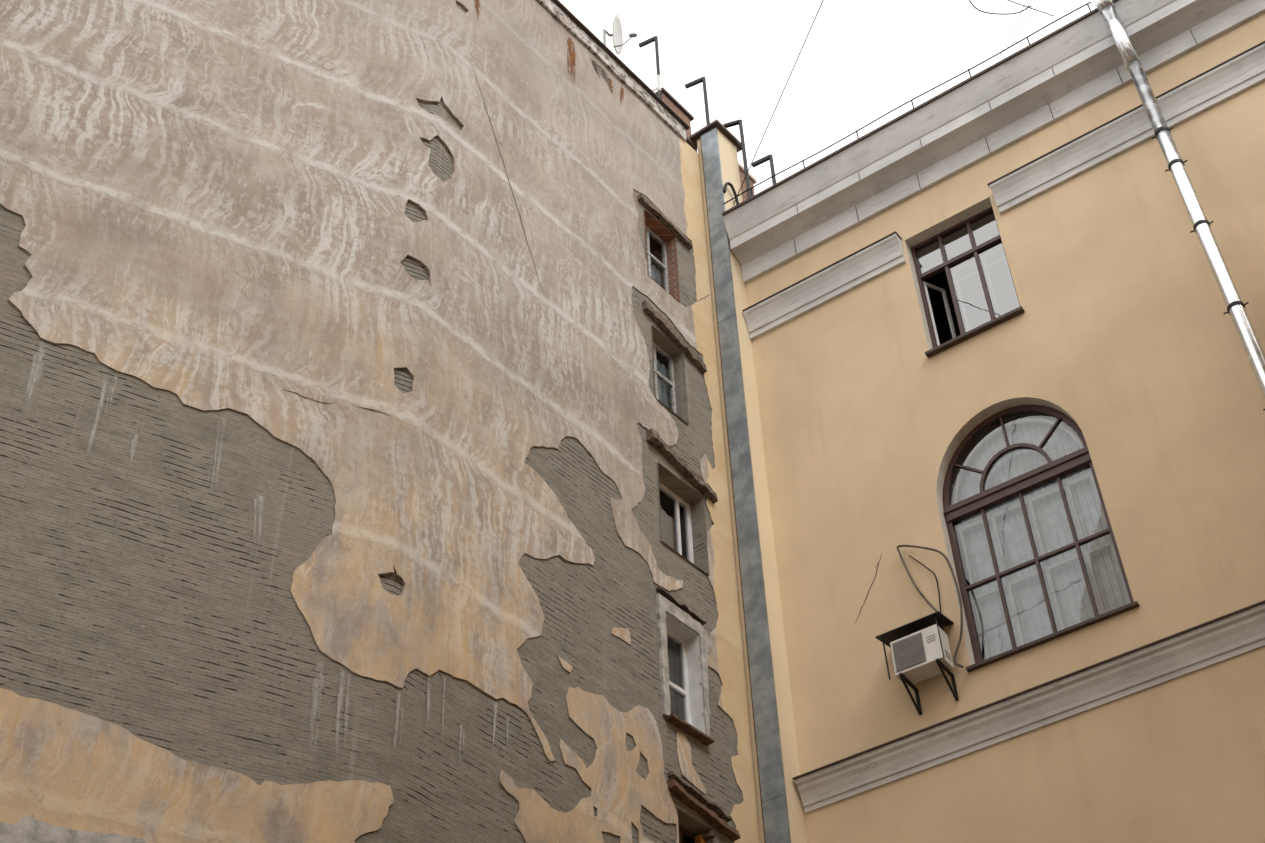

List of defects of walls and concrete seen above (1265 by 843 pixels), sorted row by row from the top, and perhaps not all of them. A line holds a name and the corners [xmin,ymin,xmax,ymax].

spalling [0,189,744,843]